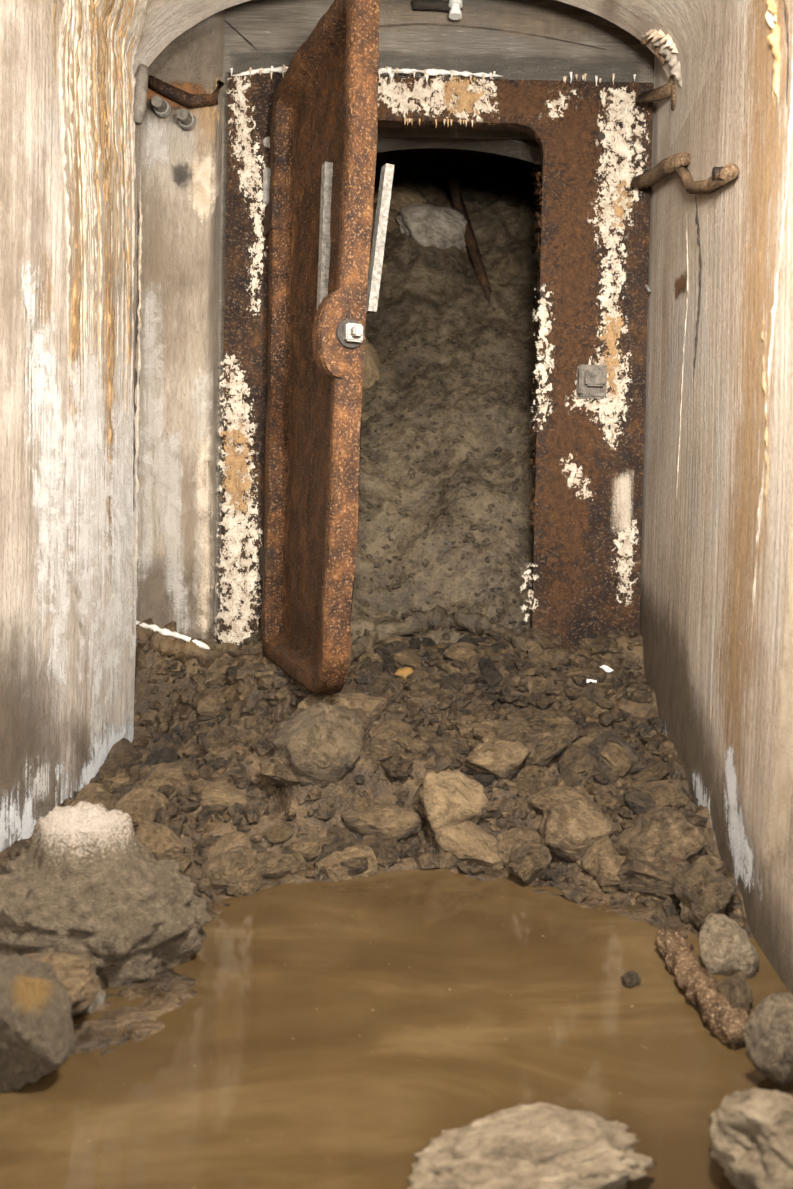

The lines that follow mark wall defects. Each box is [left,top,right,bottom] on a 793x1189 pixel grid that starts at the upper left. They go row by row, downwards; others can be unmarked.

corrosion [145,24,220,153]
leakage [230,52,295,79]
leakage [378,51,639,86]
leakage [0,0,222,852]